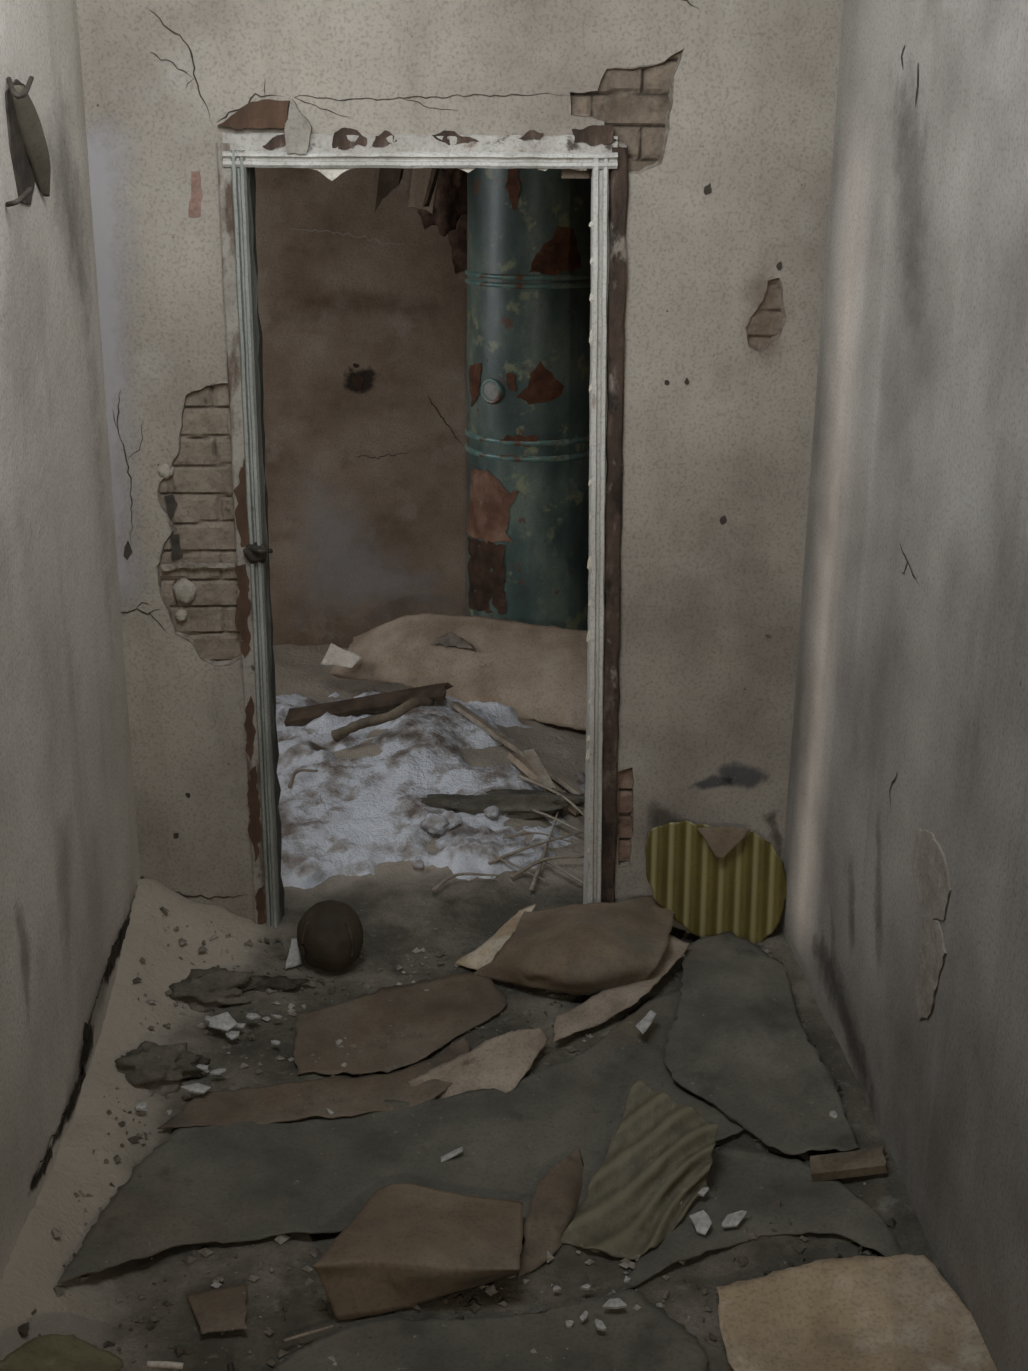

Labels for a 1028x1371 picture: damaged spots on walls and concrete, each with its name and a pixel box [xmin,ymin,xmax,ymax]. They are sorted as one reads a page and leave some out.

crack [150,10,580,123]
spalling [568,48,685,174]
spalling [536,168,591,179]
spalling [745,262,787,353]
spalling [156,382,254,667]
leakage [695,765,766,788]
crack [176,891,241,900]
crack [29,885,138,1193]